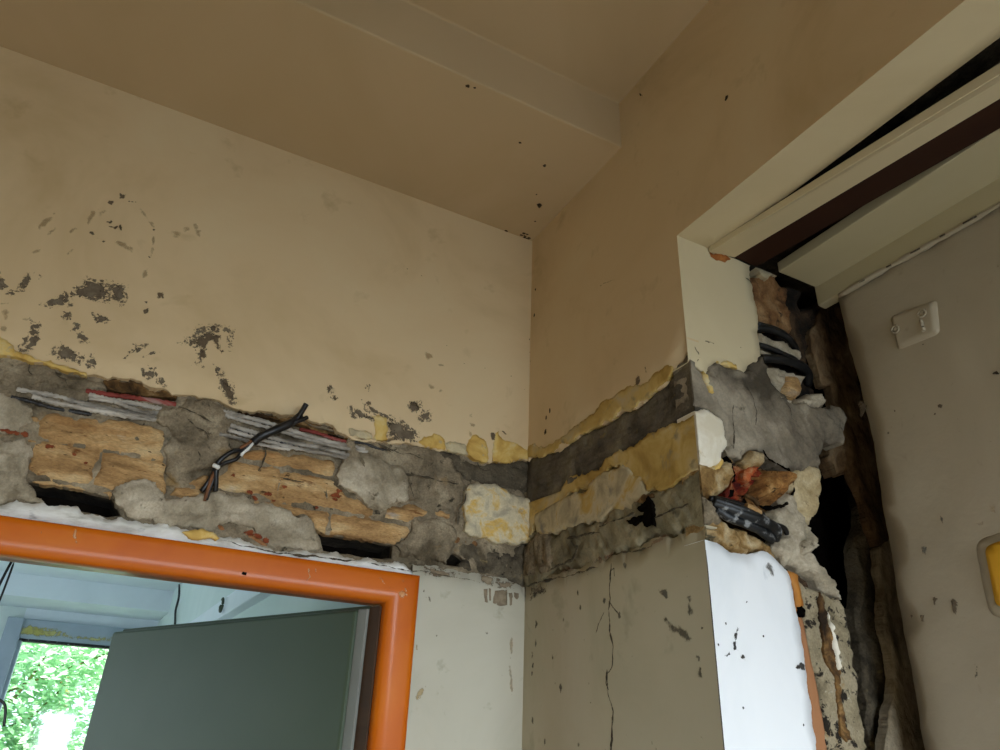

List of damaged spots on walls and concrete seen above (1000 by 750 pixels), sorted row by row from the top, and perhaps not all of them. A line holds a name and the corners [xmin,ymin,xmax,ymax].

peeling [0,273,41,295]
flaking render [749,268,822,401]
flaking render [0,277,775,606]
flaking render [785,444,847,525]
crack [527,503,688,750]
peeling [784,568,808,618]
spalling [816,592,852,742]